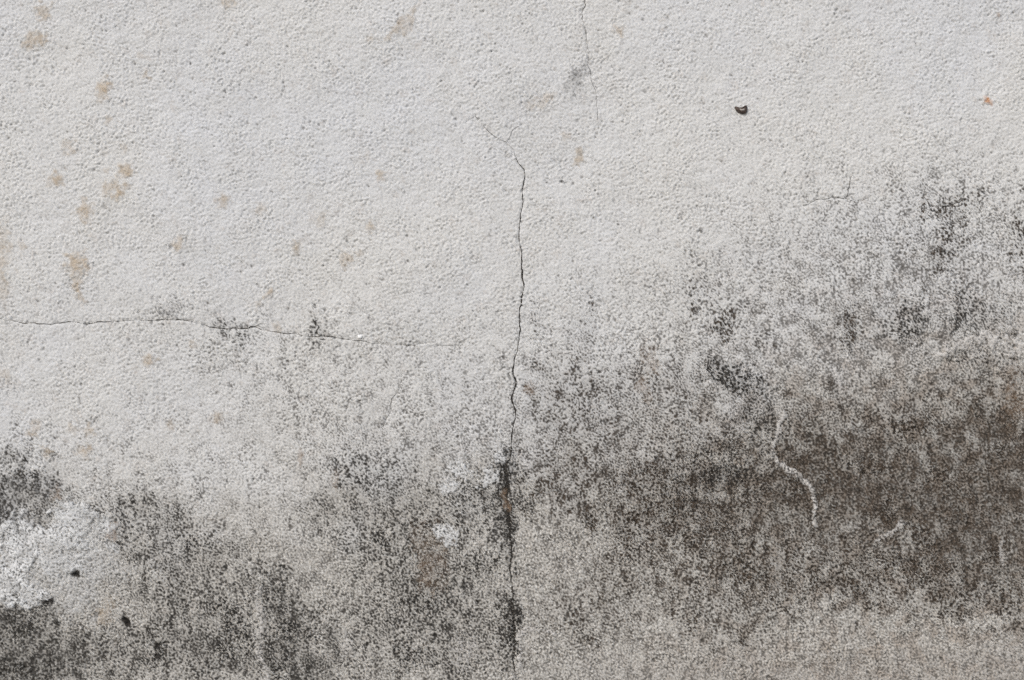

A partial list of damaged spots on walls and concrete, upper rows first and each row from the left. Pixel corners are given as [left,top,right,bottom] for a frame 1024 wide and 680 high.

leakage [920,192,980,274]
leakage [873,303,931,345]
leakage [946,289,1007,335]
crack [467,116,525,679]
leakage [0,352,1024,680]